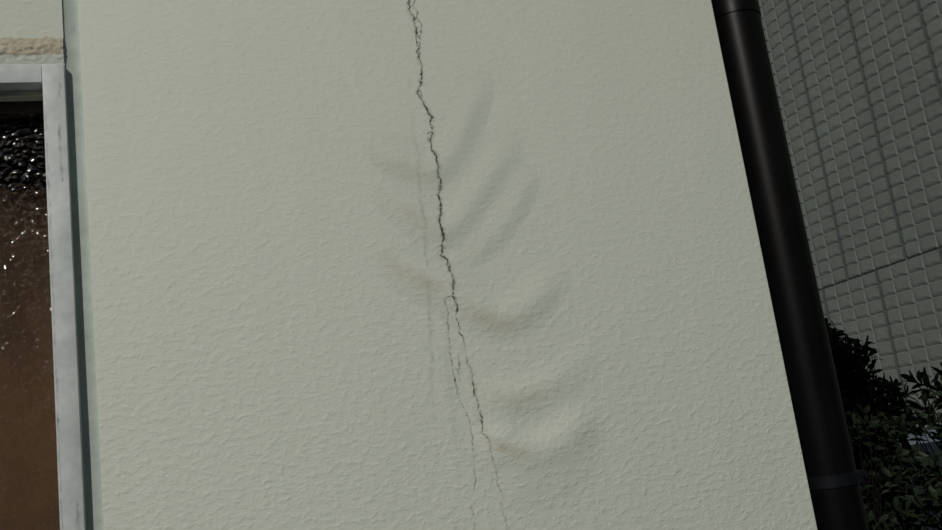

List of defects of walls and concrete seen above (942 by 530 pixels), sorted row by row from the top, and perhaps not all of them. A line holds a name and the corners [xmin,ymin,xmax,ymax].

crack [407,0,462,336]